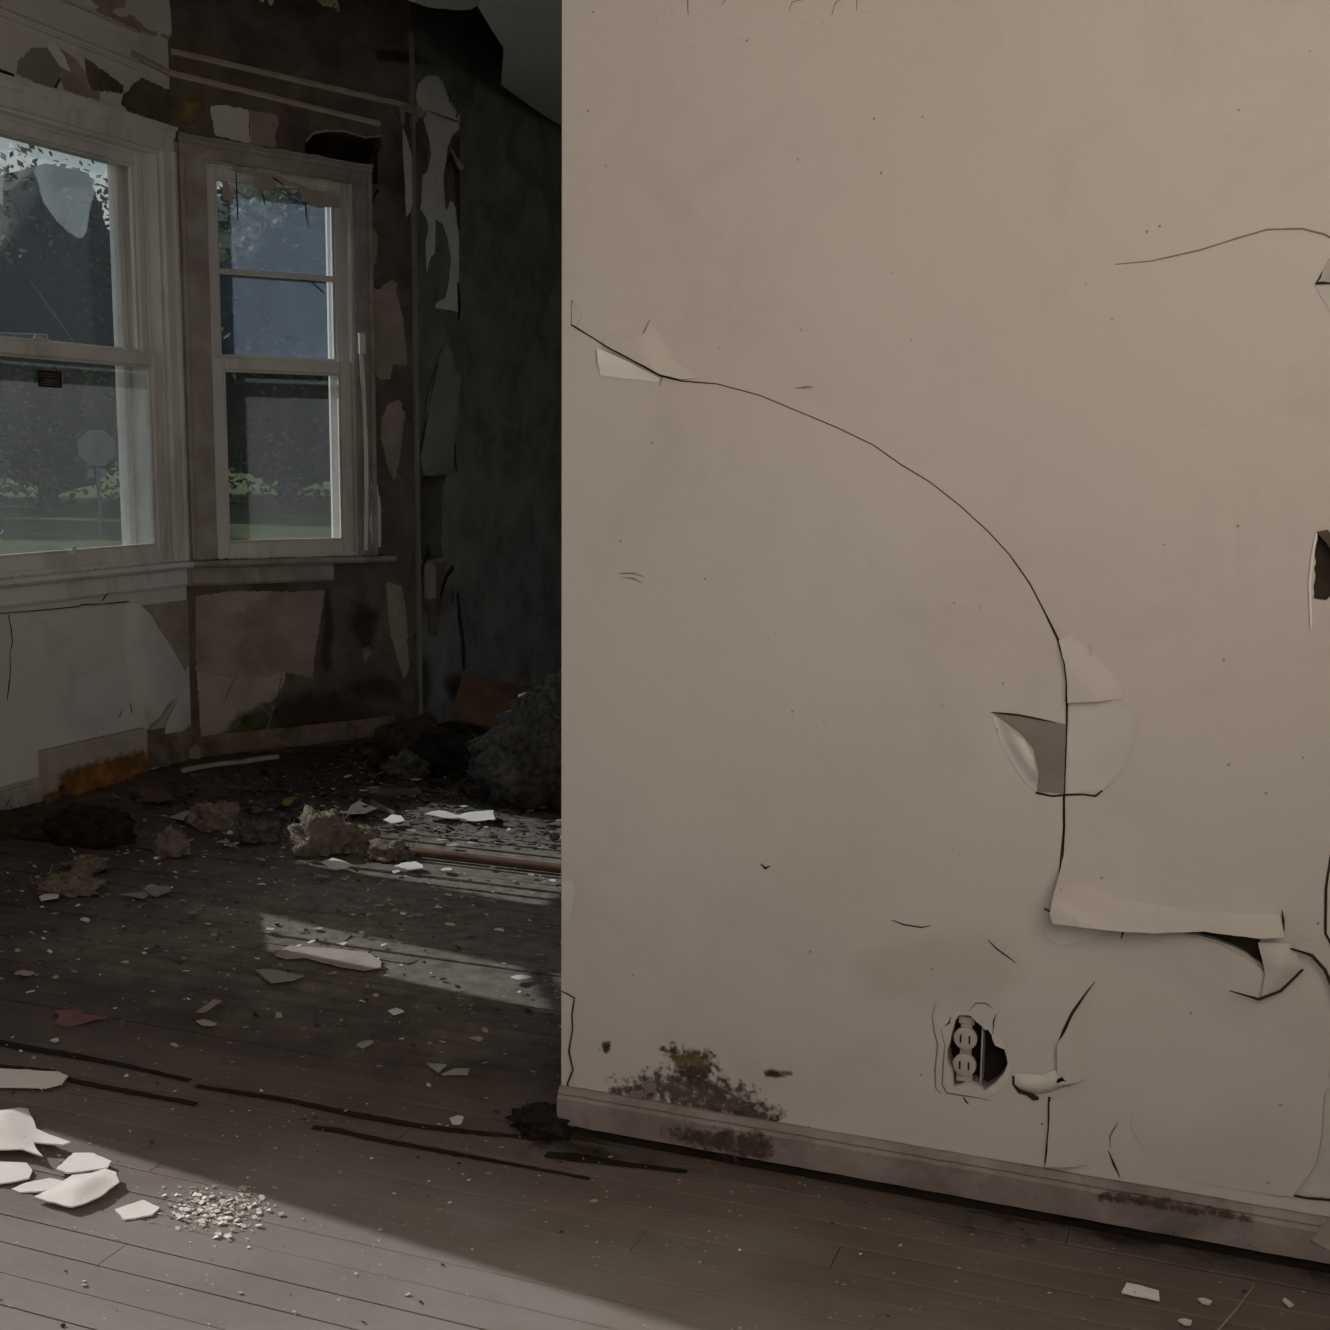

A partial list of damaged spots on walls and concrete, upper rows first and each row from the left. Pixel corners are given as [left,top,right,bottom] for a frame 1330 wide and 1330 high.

peeling [399,75,464,312]
crack [455,138,463,230]
crack [421,544,465,670]
crack [571,300,1123,703]
spalling [1313,530,1330,599]
peeling [123,590,325,759]
leakage [609,1041,783,1162]
leakage [764,1070,792,1078]
spalling [951,1015,1074,1100]
crack [1044,981,1120,1177]
peeling [1123,857,1330,1201]
leakage [1098,1192,1250,1222]